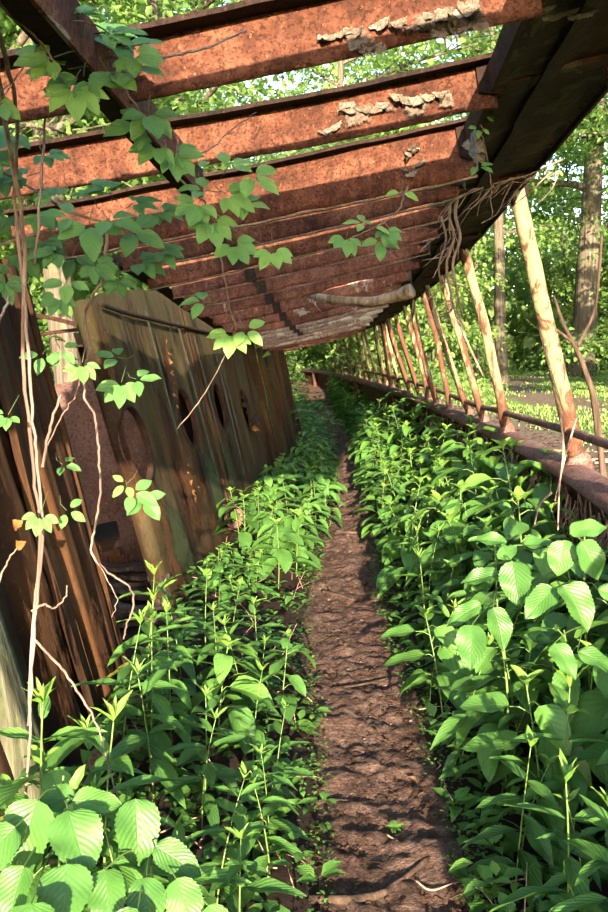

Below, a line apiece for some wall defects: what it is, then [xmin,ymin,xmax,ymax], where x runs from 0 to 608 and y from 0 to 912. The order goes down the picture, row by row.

peeling [317,0,493,58]
peeling [317,90,454,136]
peeling [400,143,425,178]
corrosion [163,336,180,414]
corrosion [174,432,205,531]
corrosion [157,498,188,602]